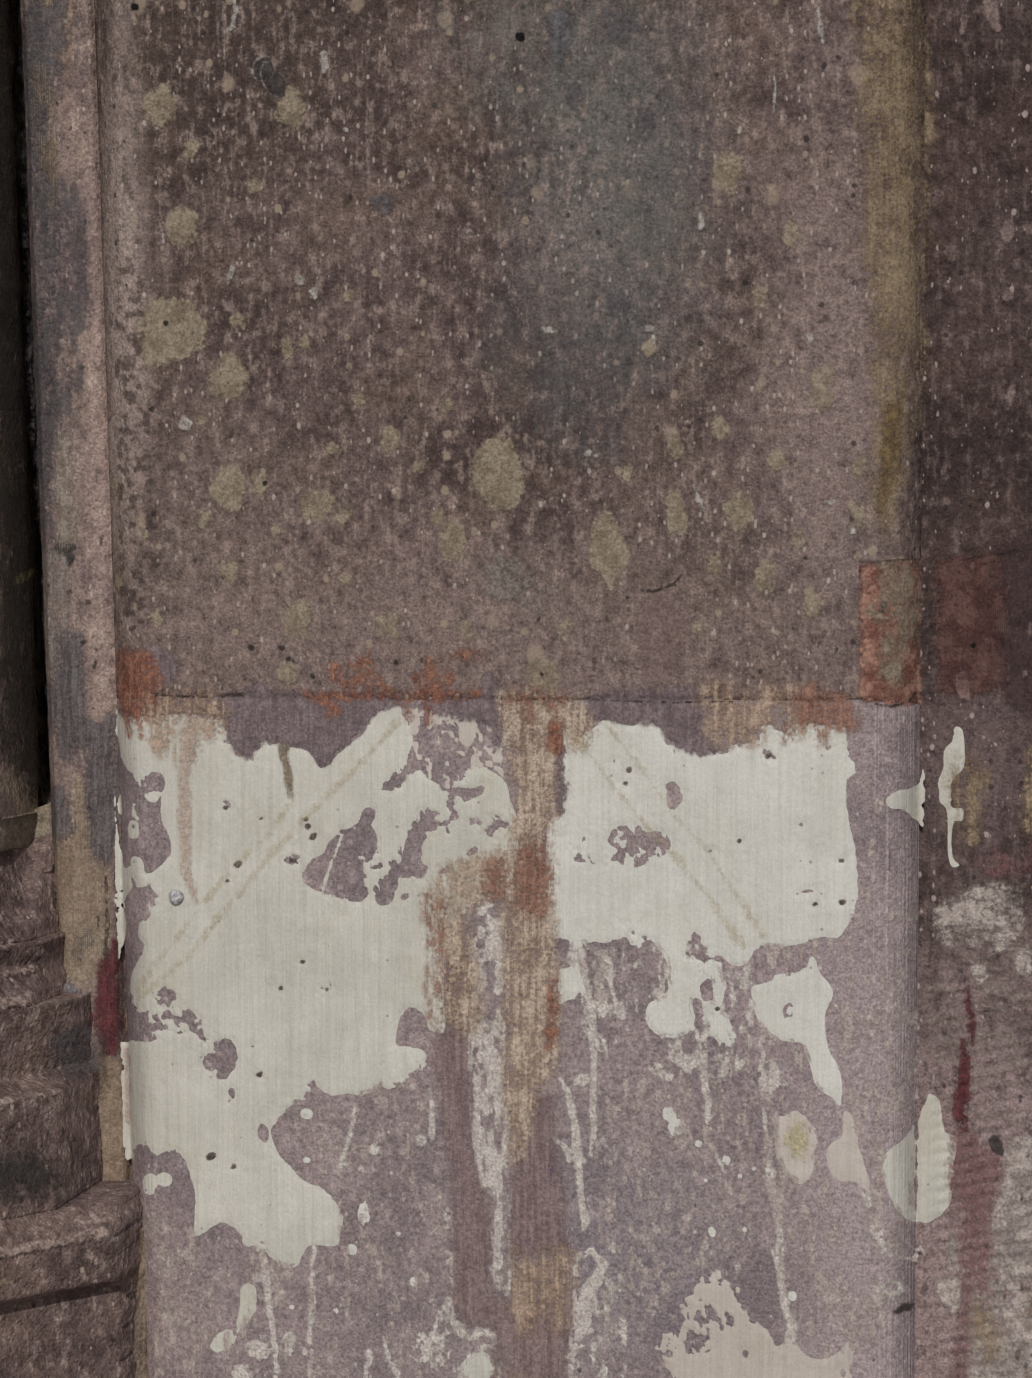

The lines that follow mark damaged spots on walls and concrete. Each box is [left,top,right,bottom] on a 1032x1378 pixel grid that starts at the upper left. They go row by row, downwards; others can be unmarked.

rust [700,680,859,746]
rust [115,647,229,895]
peeling [114,694,519,1297]
rust [304,650,593,1163]
peeling [543,720,965,1223]
peeling [933,882,1032,984]
peeling [461,1351,495,1378]
rust [510,1243,576,1338]
peeling [655,1270,854,1378]